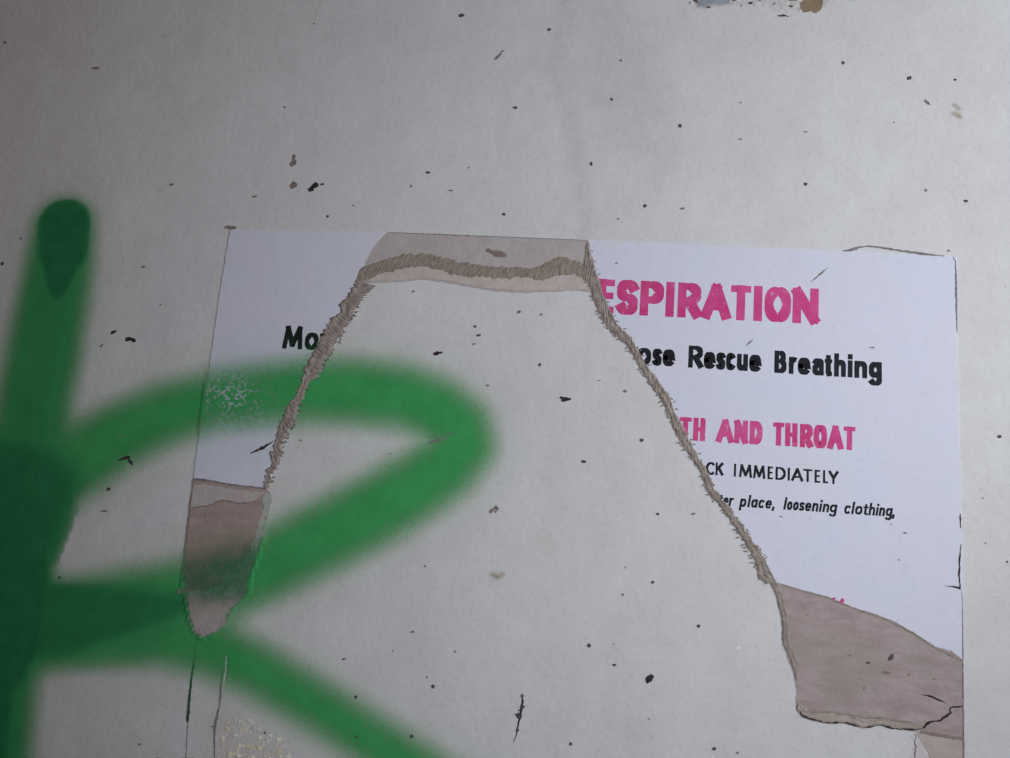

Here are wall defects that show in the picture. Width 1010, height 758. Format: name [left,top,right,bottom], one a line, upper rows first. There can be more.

peeling [689,0,836,17]